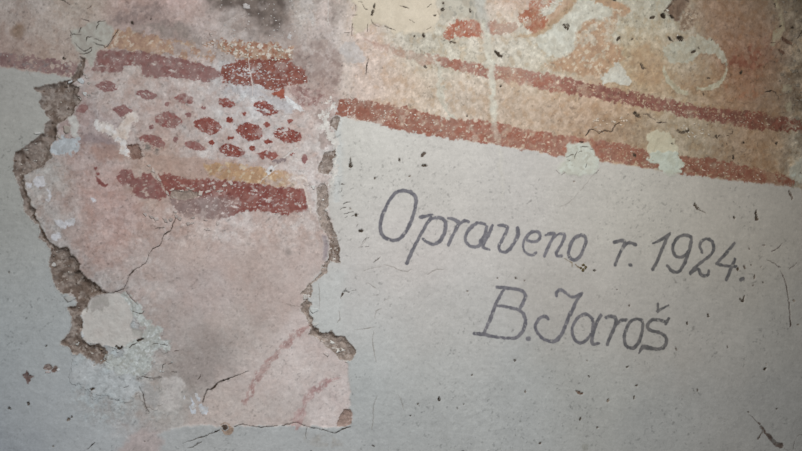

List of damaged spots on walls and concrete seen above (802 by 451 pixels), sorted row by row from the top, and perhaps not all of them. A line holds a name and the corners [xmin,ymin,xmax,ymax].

peeling [214,36,306,85]
spalling [126,142,161,182]
spalling [12,55,123,366]
spalling [143,182,233,226]
crack [102,218,176,315]
spalling [43,363,60,373]
crack [115,342,179,413]
crack [196,371,250,403]
hole [220,422,234,436]
spalling [336,408,353,427]